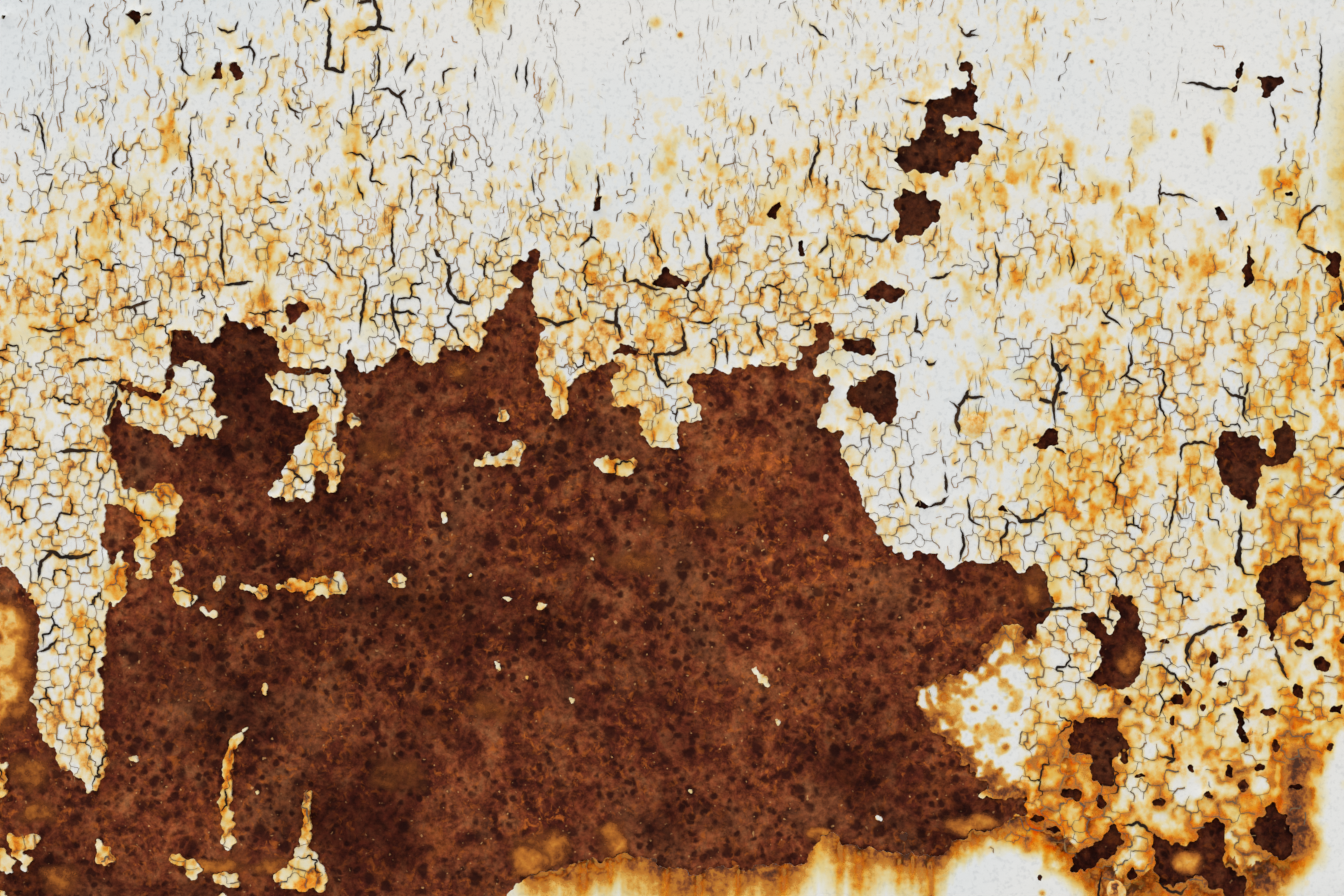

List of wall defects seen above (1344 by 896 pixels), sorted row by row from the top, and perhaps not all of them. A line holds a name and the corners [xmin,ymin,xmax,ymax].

crack [945,0,1001,75]
crack [1174,45,1236,114]
crack [1284,35,1323,140]
crack [1014,117,1077,192]
peeling [0,249,1061,896]
corrosion [1261,457,1343,671]
corrosion [0,598,37,741]
corrosion [0,755,56,821]
corrosion [197,858,289,875]
crack [279,791,323,889]
corrosion [510,626,1329,896]
crack [1221,675,1343,805]